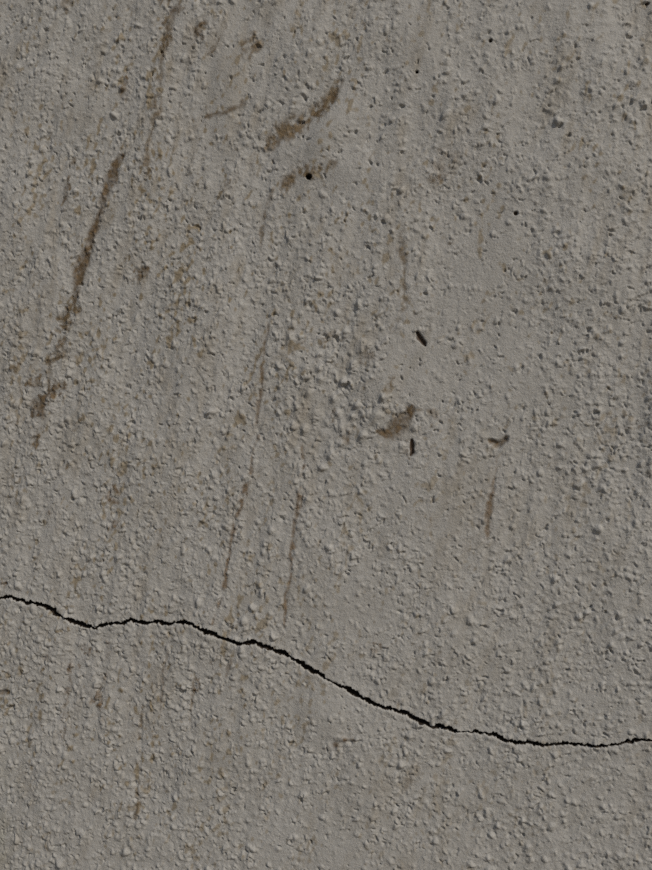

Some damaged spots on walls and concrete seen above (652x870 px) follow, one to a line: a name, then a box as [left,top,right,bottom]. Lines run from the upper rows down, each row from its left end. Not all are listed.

crack [0,590,652,754]